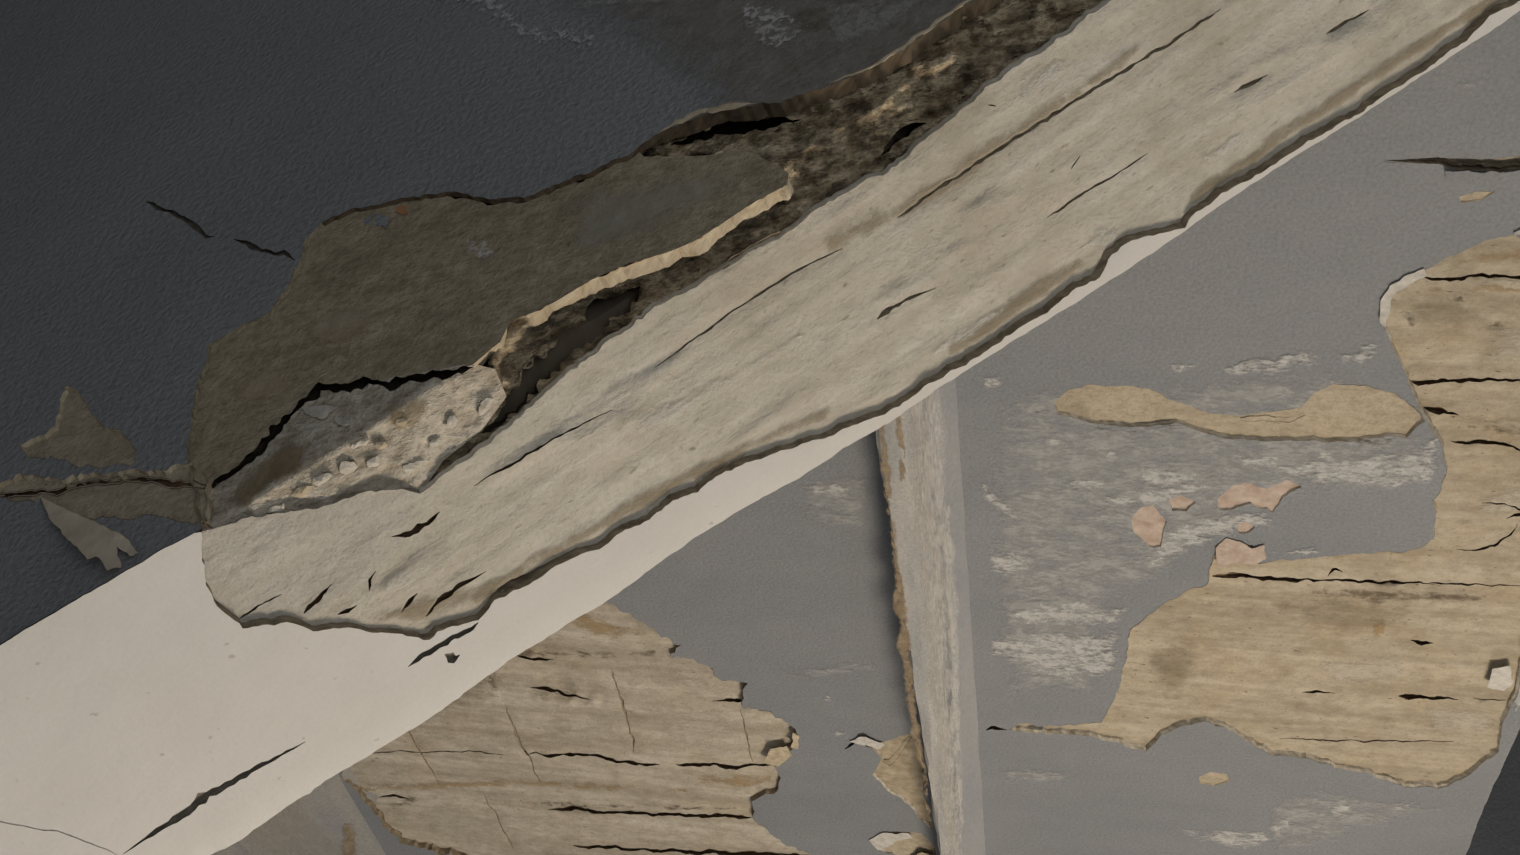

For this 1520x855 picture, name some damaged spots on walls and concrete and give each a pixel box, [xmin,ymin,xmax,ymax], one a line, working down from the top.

damp [583,0,975,106]
crack [146,201,295,261]
crack [1388,157,1520,184]
spalling [0,0,1520,640]
damp [1166,353,1335,416]
crack [1,474,207,498]
damp [982,393,1437,688]
spalling [1010,230,1520,789]
spalling [341,602,811,855]
peeling [850,734,936,855]